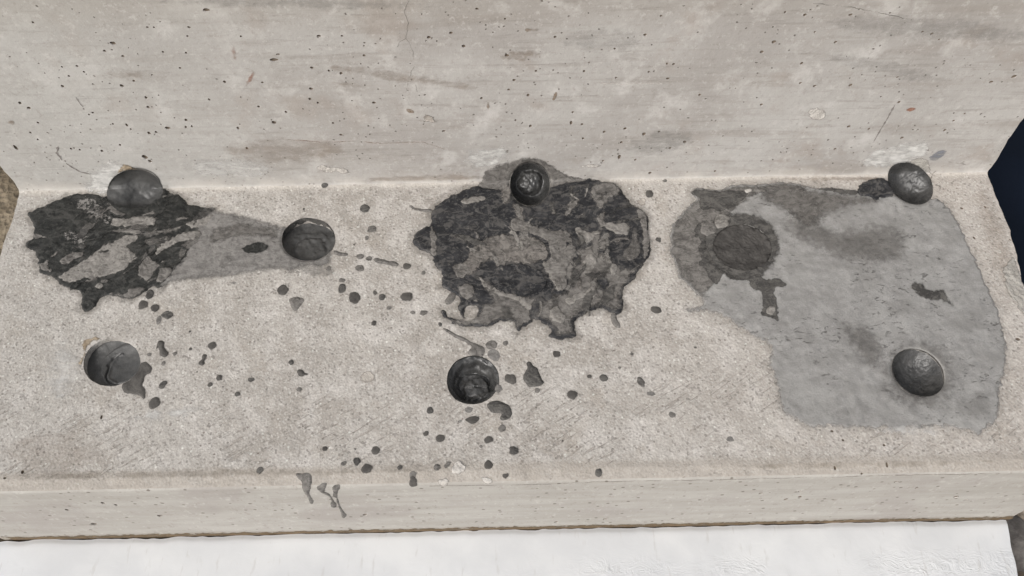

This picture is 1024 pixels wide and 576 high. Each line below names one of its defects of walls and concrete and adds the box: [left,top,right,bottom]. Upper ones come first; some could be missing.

water stain [819,187,858,195]
water stain [210,223,276,242]
water stain [691,190,786,321]
water stain [912,282,951,304]